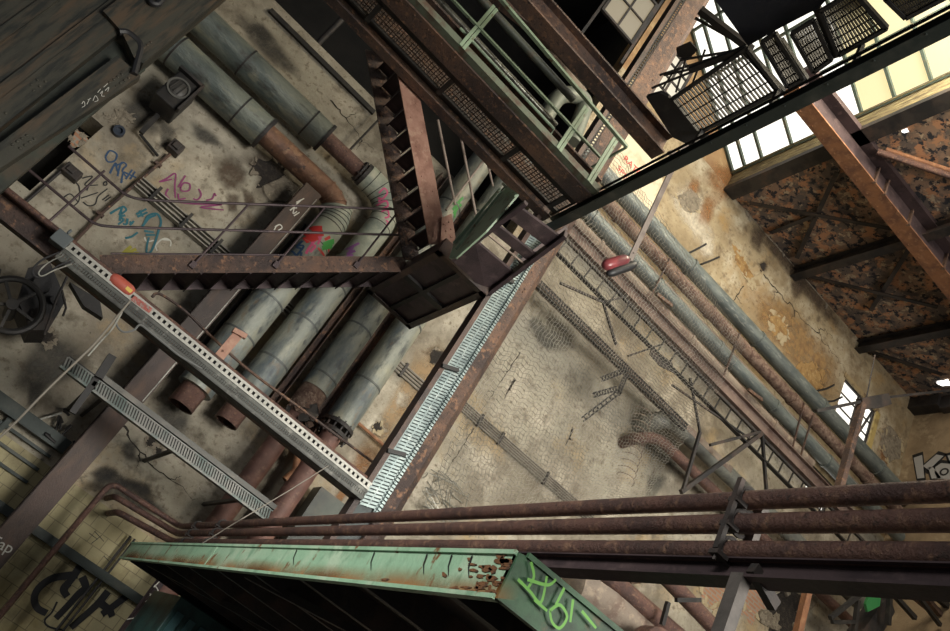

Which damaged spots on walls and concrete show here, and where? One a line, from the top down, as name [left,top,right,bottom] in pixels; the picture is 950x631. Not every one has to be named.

flaking render [675,187,702,215]
flaking render [767,309,790,346]
crack [733,270,844,368]
crack [123,425,194,500]
corrosion [124,550,361,580]
corrosion [377,554,428,586]
corrosion [442,554,512,599]